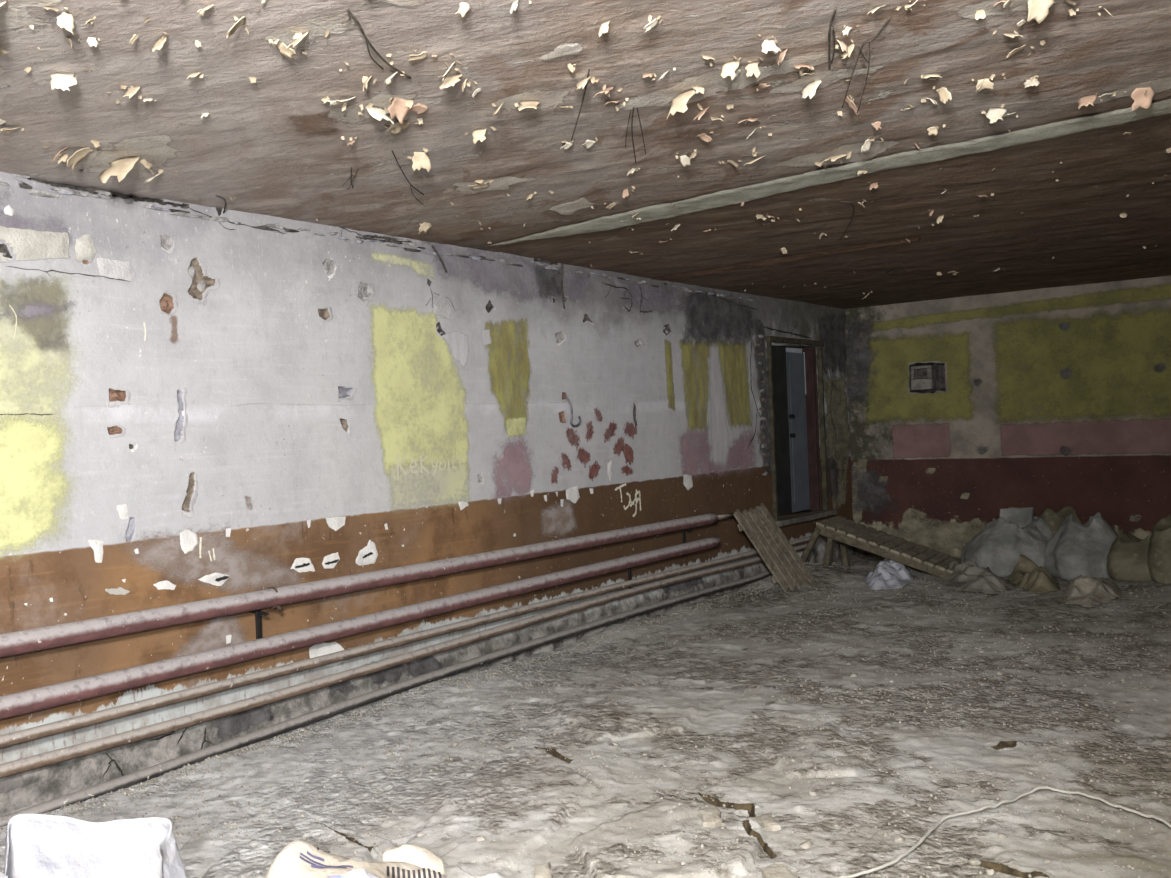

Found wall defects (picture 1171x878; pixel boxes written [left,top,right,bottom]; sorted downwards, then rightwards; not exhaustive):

peeling [956,0,1079,58]
peeling [50,69,92,91]
peeling [321,49,482,146]
peeling [464,0,925,210]
peeling [901,74,952,111]
peeling [981,104,1018,132]
peeling [1078,77,1171,111]
peeling [0,135,522,267]
spalling [155,228,220,319]
leakage [611,277,757,343]
peeling [291,552,340,573]
peeling [356,540,378,566]